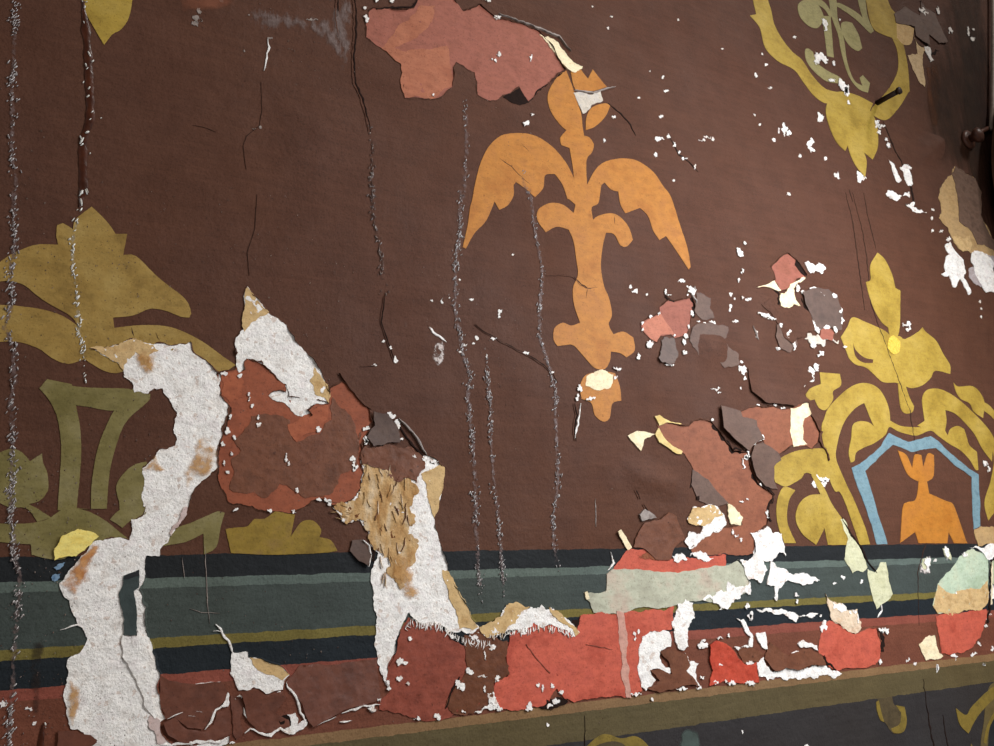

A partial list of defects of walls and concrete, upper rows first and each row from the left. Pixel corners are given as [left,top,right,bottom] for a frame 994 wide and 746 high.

water stain [6,0,21,39]
crack [192,8,203,27]
crack [243,37,272,166]
crack [306,0,371,132]
peeling [363,0,583,127]
peeling [574,86,636,136]
peeling [875,120,994,319]
water stain [1,59,26,746]
water stain [448,99,507,603]
water stain [522,170,563,571]
peeling [51,252,893,746]
peeling [906,525,994,672]